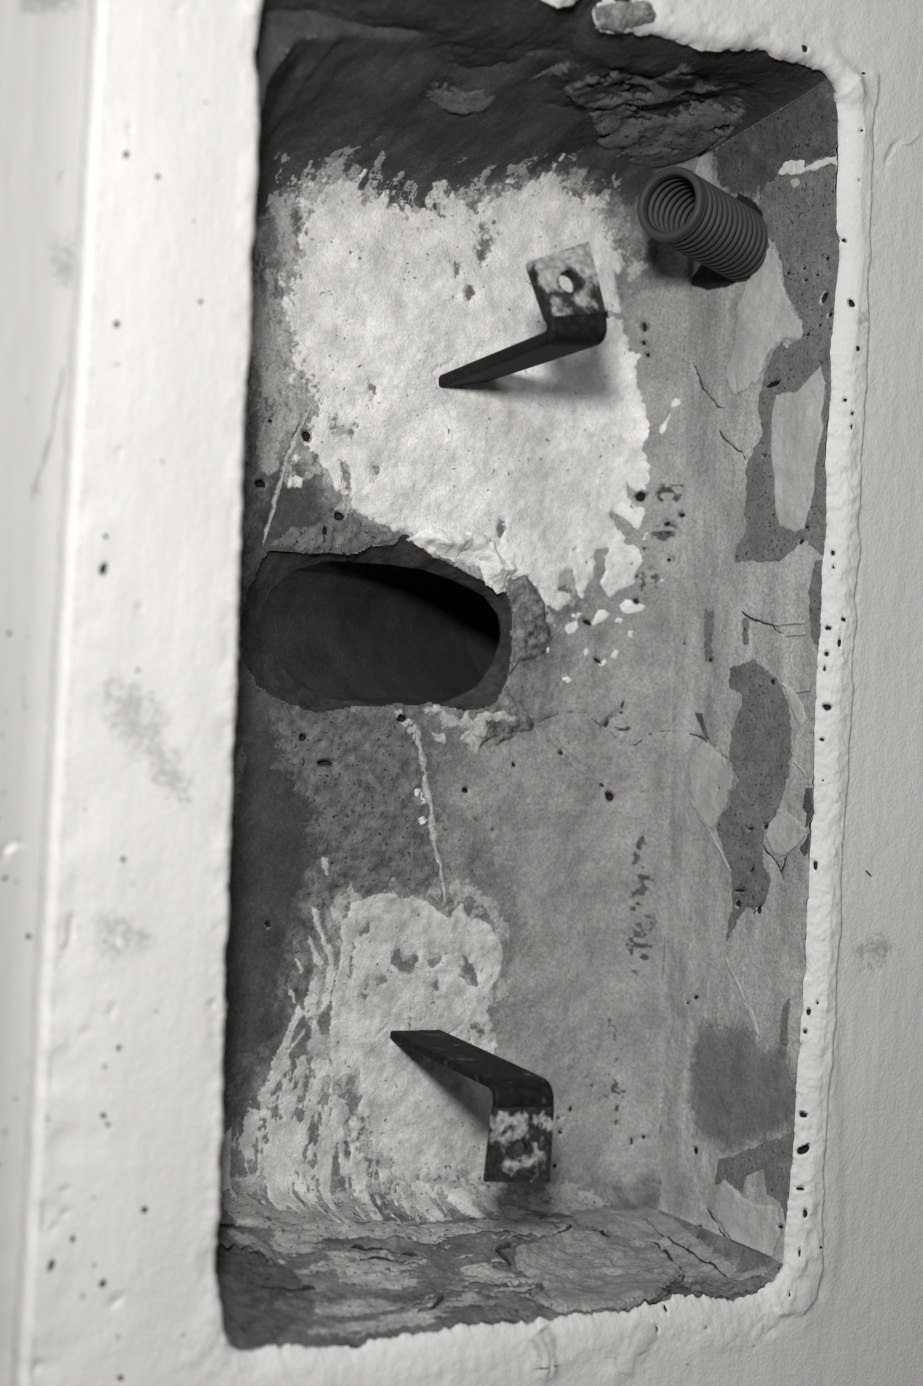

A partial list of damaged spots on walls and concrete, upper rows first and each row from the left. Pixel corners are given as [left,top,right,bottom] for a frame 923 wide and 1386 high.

peeling [725,92,840,652]
peeling [288,475,303,488]
spalling [270,515,398,554]
spalling [256,575,645,898]
peeling [688,660,815,939]
peeling [779,998,790,1057]
peeling [215,1245,308,1351]
crack [495,1243,511,1266]
spalling [478,1285,543,1321]
crack [553,1224,609,1237]
crack [645,1208,732,1296]
peeling [714,1132,795,1256]